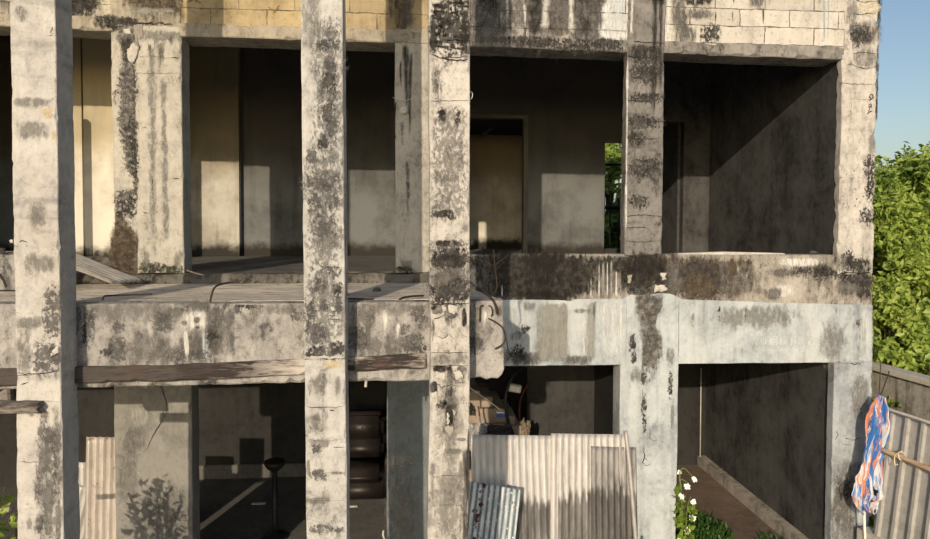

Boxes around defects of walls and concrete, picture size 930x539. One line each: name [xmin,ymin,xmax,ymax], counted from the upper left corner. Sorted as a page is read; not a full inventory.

leakage [116,62,139,195]
leakage [145,31,175,231]
leakage [303,0,342,247]
leakage [470,0,721,145]
mould [628,194,649,211]
mould [628,157,662,179]
leakage [76,239,875,365]
spalling [430,366,466,456]